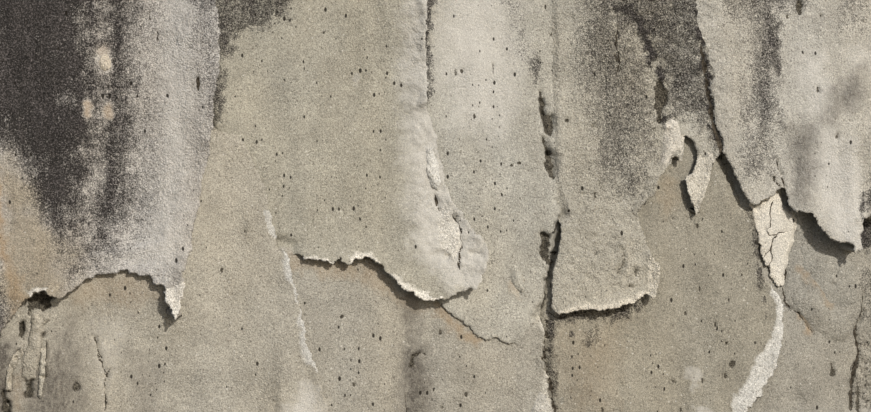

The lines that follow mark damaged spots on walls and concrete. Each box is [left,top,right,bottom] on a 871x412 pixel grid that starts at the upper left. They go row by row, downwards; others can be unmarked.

flaking render [785,0,829,41]
damp [0,262,27,407]
flaking render [0,198,96,412]
damp [20,291,170,412]
damp [0,0,309,298]
damp [259,357,330,412]
flaking render [134,0,818,412]
crack [541,312,563,412]
damp [377,0,871,412]
flaking render [822,230,859,253]